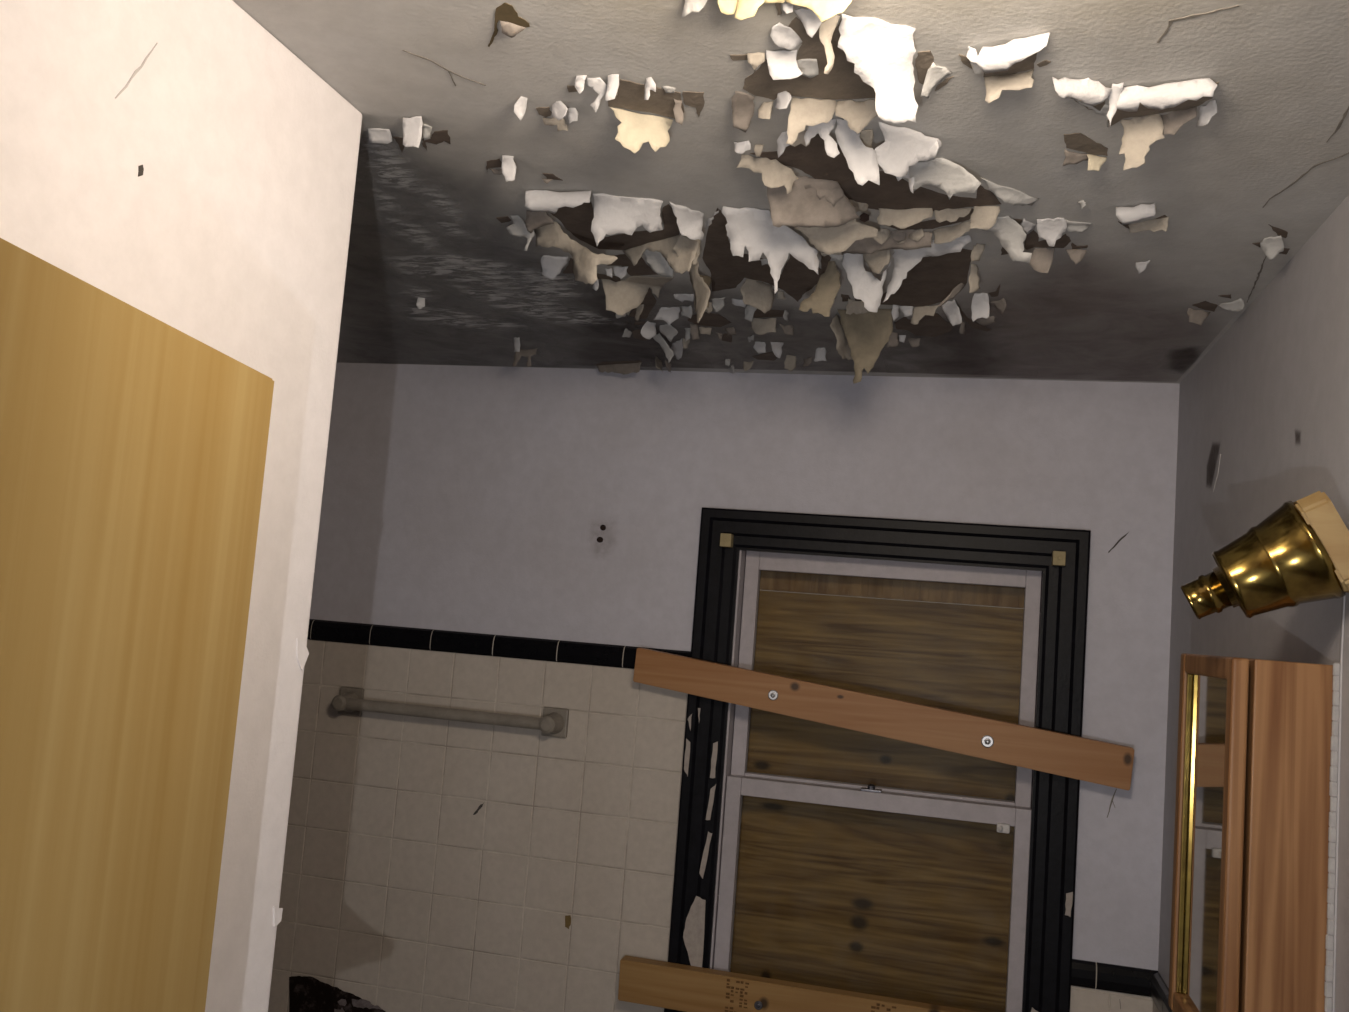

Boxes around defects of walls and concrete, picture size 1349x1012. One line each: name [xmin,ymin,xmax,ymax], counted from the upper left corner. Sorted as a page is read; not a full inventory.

crack [115,43,158,98]
crack [402,50,486,86]
peeling [486,0,1219,384]
crack [1263,107,1349,208]
leakage [348,144,659,370]
crack [1247,256,1267,302]
peeling [684,708,701,776]
peeling [699,742,718,879]
peeling [683,896,706,967]